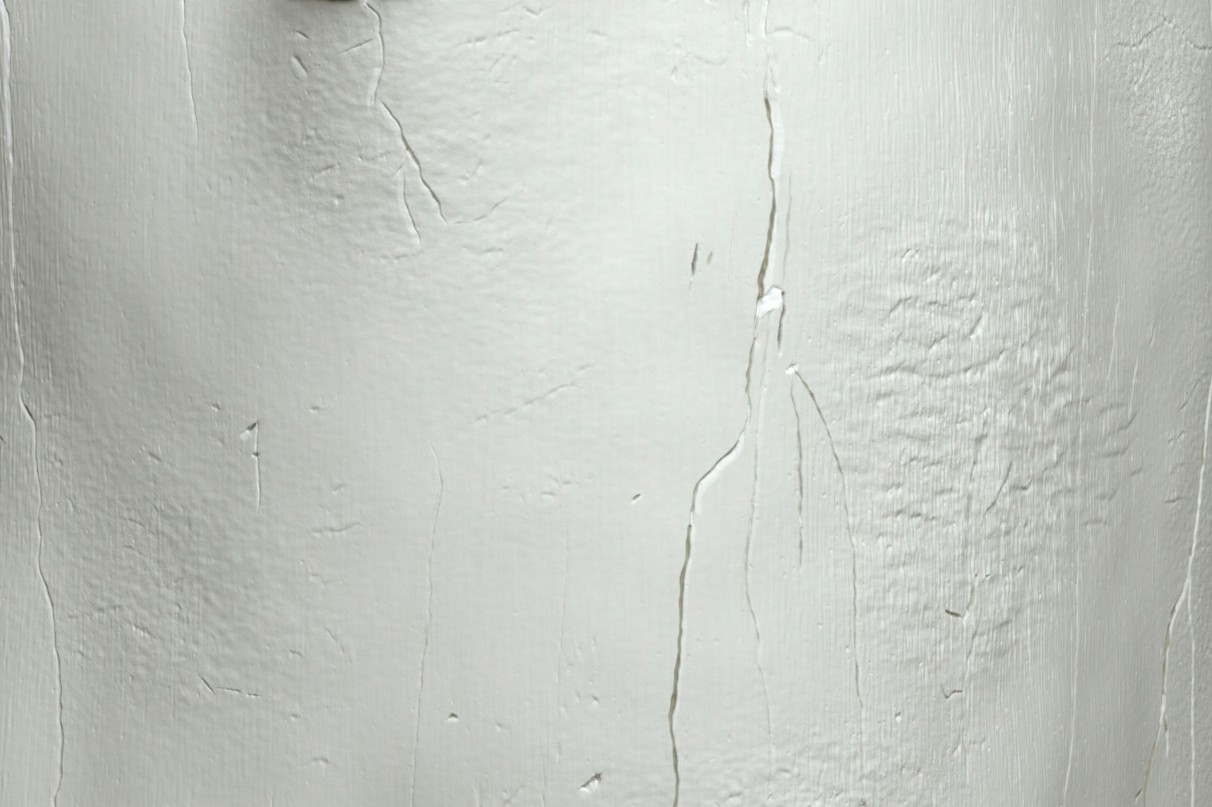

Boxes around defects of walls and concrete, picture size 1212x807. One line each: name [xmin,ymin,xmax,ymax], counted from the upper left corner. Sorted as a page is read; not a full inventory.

crack [0,0,73,807]
crack [656,0,874,807]
crack [1131,353,1212,807]